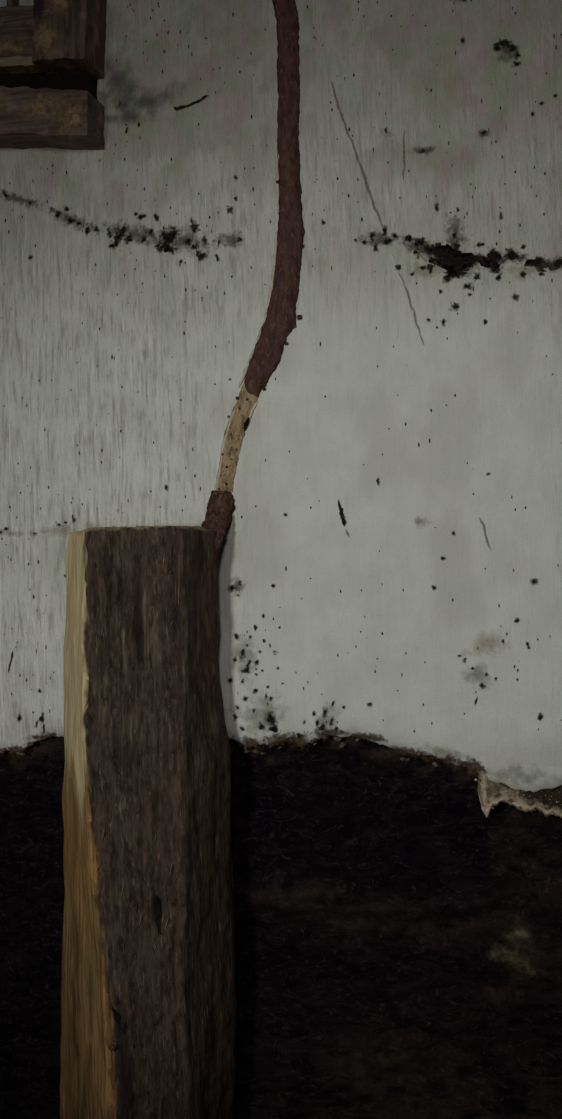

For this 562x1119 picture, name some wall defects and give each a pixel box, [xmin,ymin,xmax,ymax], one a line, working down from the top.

leakage [3,181,242,266]
crack [331,81,424,345]
leakage [354,196,562,314]
leakage [228,607,283,731]
leakage [297,694,345,738]
spalling [0,713,65,1119]
spalling [229,735,562,1119]